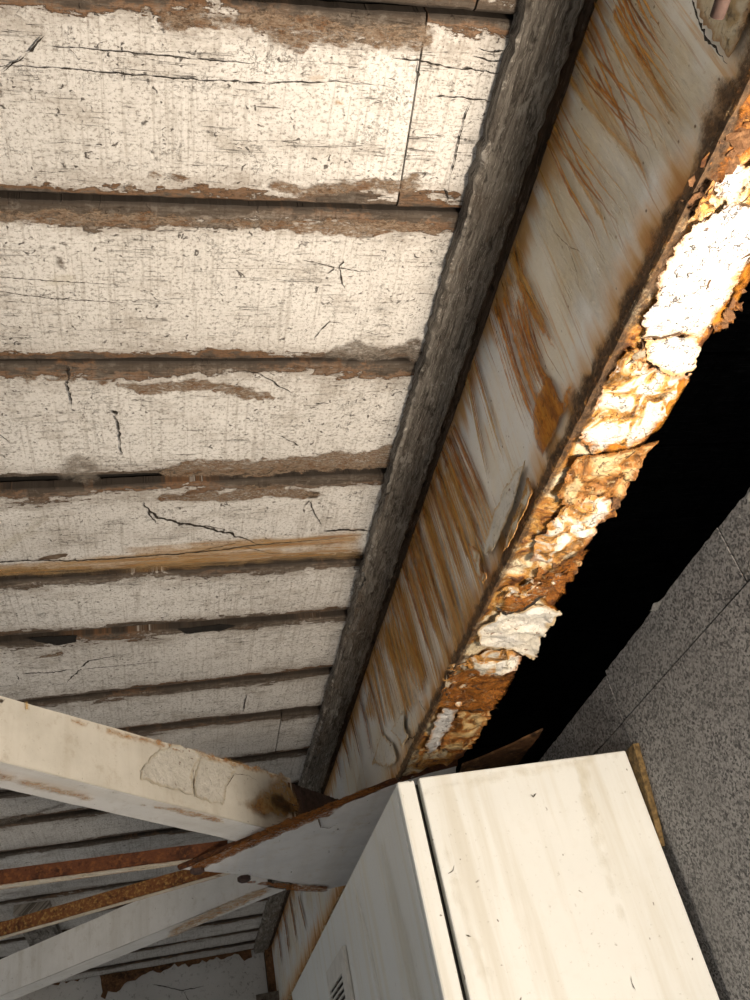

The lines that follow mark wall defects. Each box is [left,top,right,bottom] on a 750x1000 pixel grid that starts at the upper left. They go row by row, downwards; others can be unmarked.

peeling [160,5,436,54]
rust [570,0,681,188]
peeling [270,173,421,198]
peeling [0,208,443,240]
rust [177,34,750,877]
rust [0,534,357,575]
crack [0,500,370,563]
peeling [468,461,533,584]
peeling [465,605,562,677]
peeling [425,708,491,753]
rust [170,881,328,961]
rust [100,949,254,999]